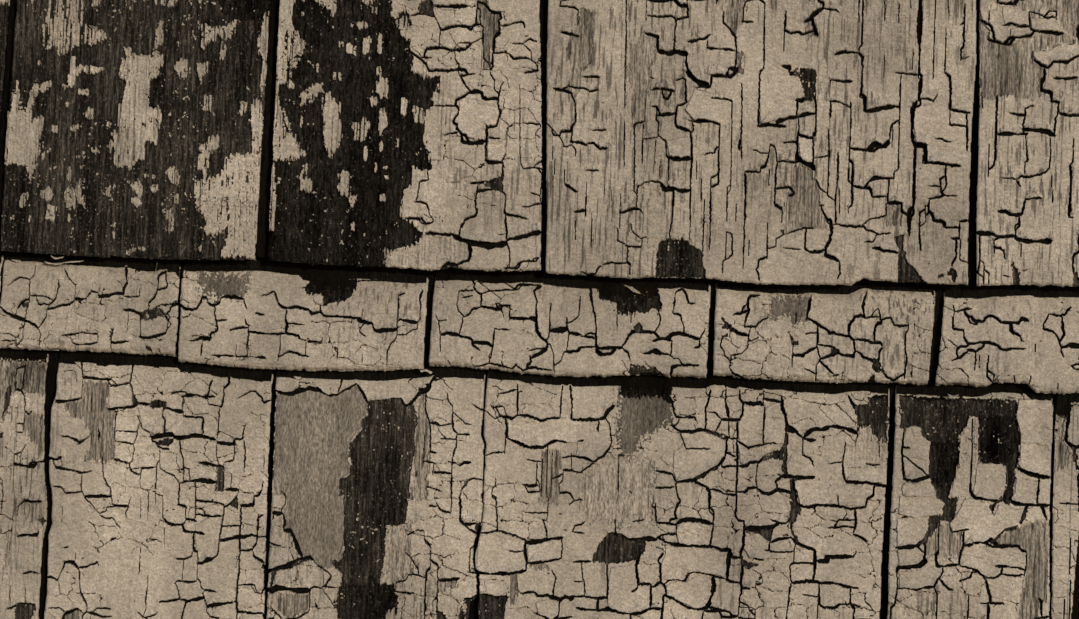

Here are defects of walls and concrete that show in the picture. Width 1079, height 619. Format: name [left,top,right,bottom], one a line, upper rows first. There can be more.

peeling [0,0,399,278]
crack [402,0,608,272]
crack [581,0,1079,284]
peeling [323,394,434,614]
crack [0,268,1059,619]
peeling [508,418,662,613]
peeling [655,238,706,279]
peeling [662,522,727,608]
peeling [673,395,1079,619]
crack [960,419,1079,619]
crack [1043,302,1079,371]
crack [1052,403,1079,449]